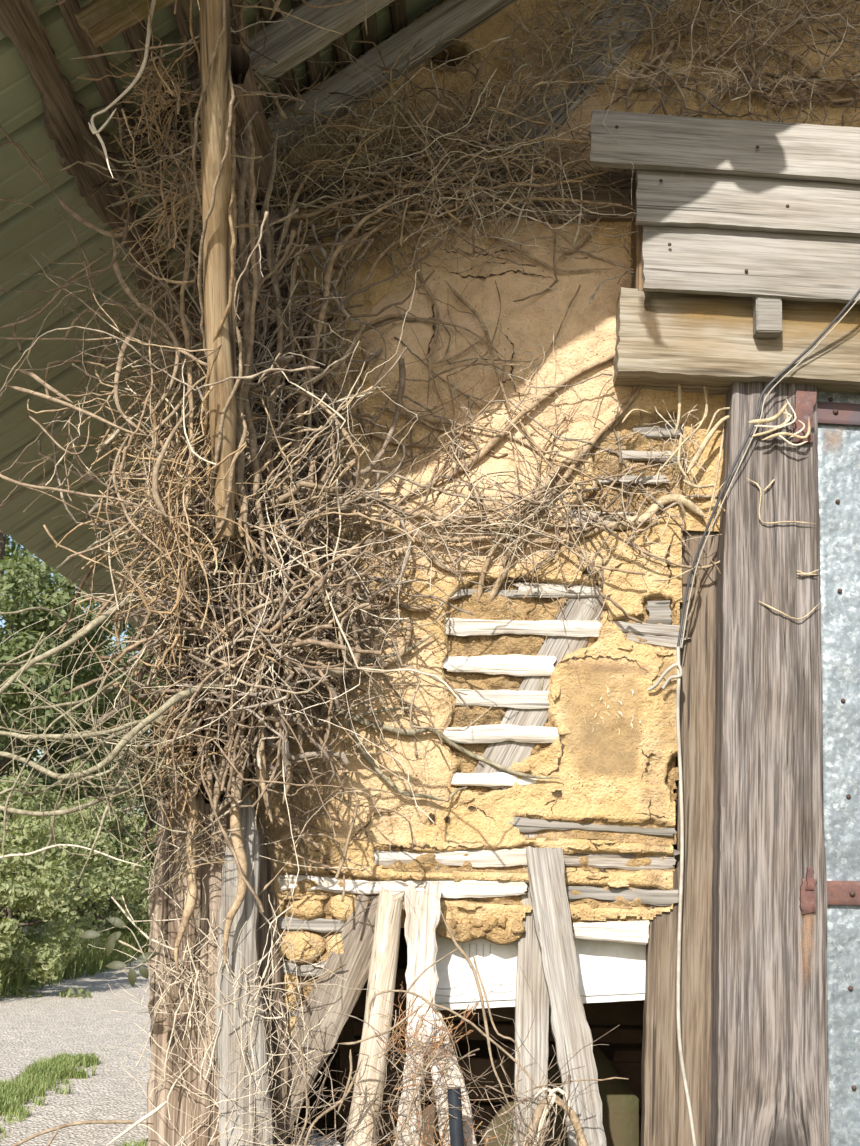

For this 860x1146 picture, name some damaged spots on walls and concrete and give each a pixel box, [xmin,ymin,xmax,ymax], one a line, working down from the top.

spalling [574,411,690,524]
spalling [432,568,570,727]
crack [555,649,666,691]
spalling [599,597,679,656]
spalling [509,718,572,773]
spalling [445,743,489,812]
spalling [549,789,564,799]
spalling [665,756,679,802]
spalling [277,808,677,1006]